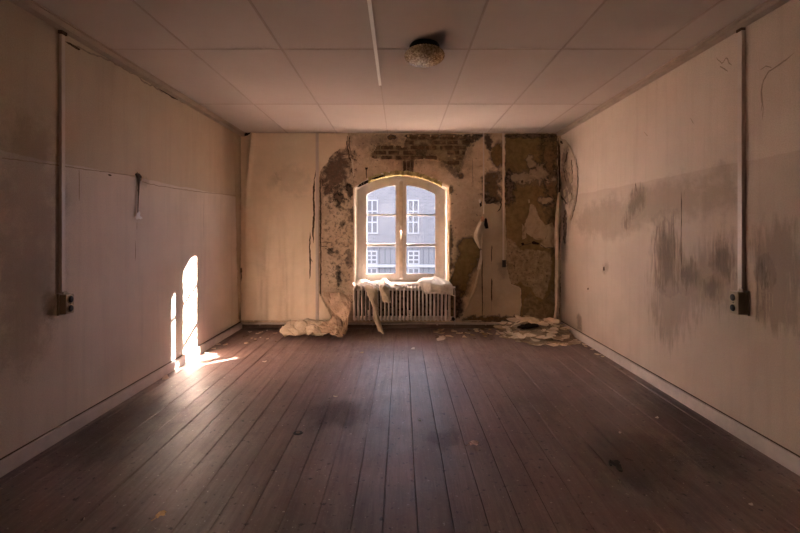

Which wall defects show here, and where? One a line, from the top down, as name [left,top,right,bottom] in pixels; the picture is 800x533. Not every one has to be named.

flaking render [358,134,475,187]
peeling [520,199,554,248]
peeling [522,284,555,319]